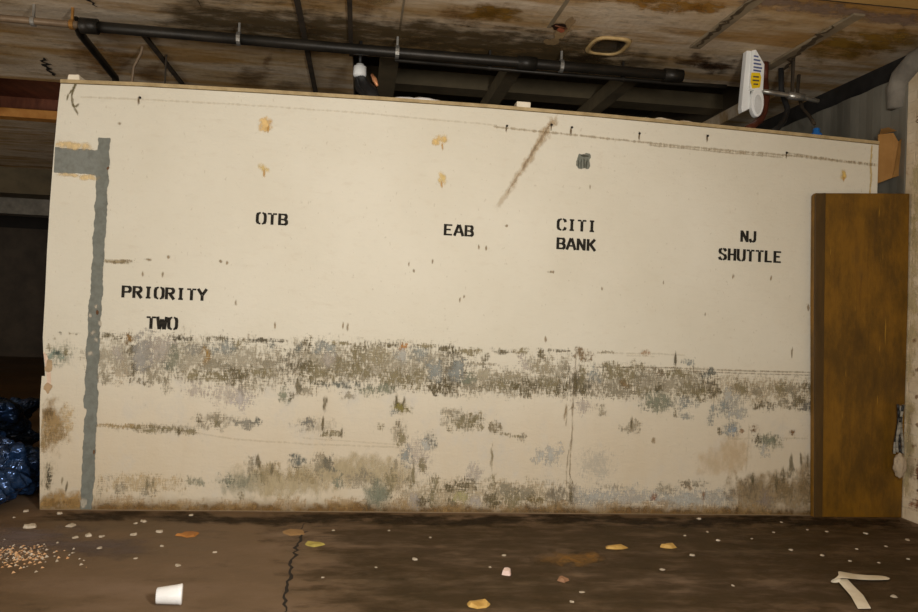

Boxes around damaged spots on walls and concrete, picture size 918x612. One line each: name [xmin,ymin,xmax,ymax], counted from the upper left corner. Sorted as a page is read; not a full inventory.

water stain [163,0,650,67]
water stain [617,0,725,13]
water stain [676,54,733,74]
peeling [54,138,811,512]
spalling [43,350,68,394]
crack [282,524,308,612]